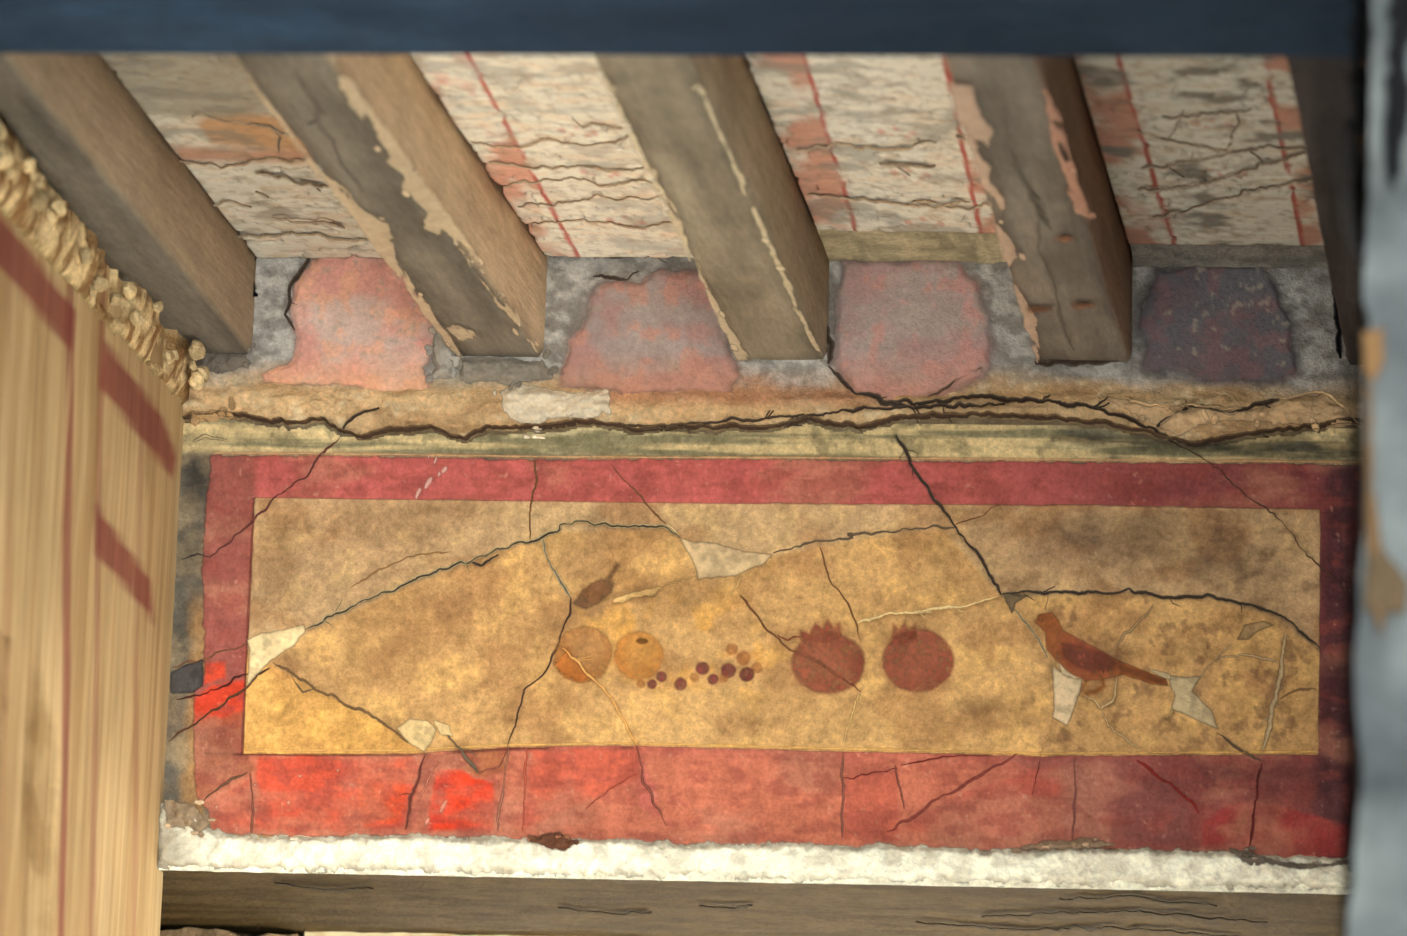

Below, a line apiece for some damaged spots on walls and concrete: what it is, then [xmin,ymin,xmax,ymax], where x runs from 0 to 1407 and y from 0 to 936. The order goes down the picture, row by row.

crack [179,78,368,331]
peeling [244,76,611,439]
peeling [949,84,1026,267]
peeling [1014,284,1040,363]
peeling [1042,89,1096,219]
crack [169,108,1358,846]